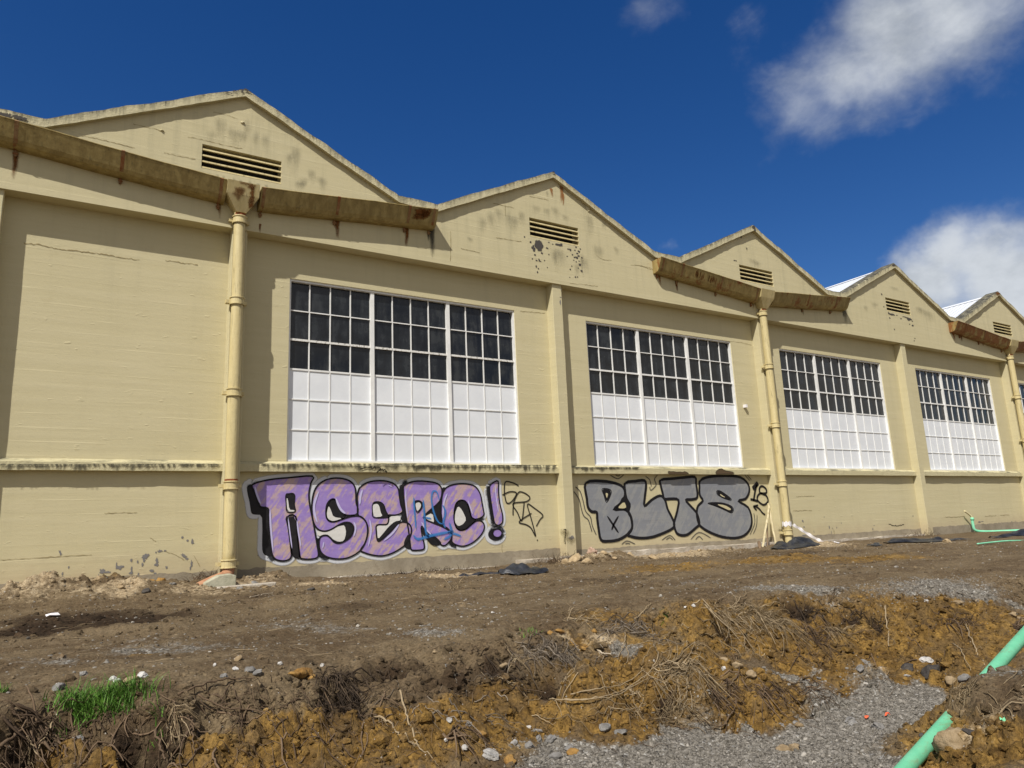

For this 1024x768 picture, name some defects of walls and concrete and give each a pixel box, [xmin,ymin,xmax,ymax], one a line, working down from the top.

corrosion [234,184,255,216]
corrosion [405,208,431,244]
crack [24,243,139,260]
peeling [524,236,582,278]
peeling [98,550,167,576]